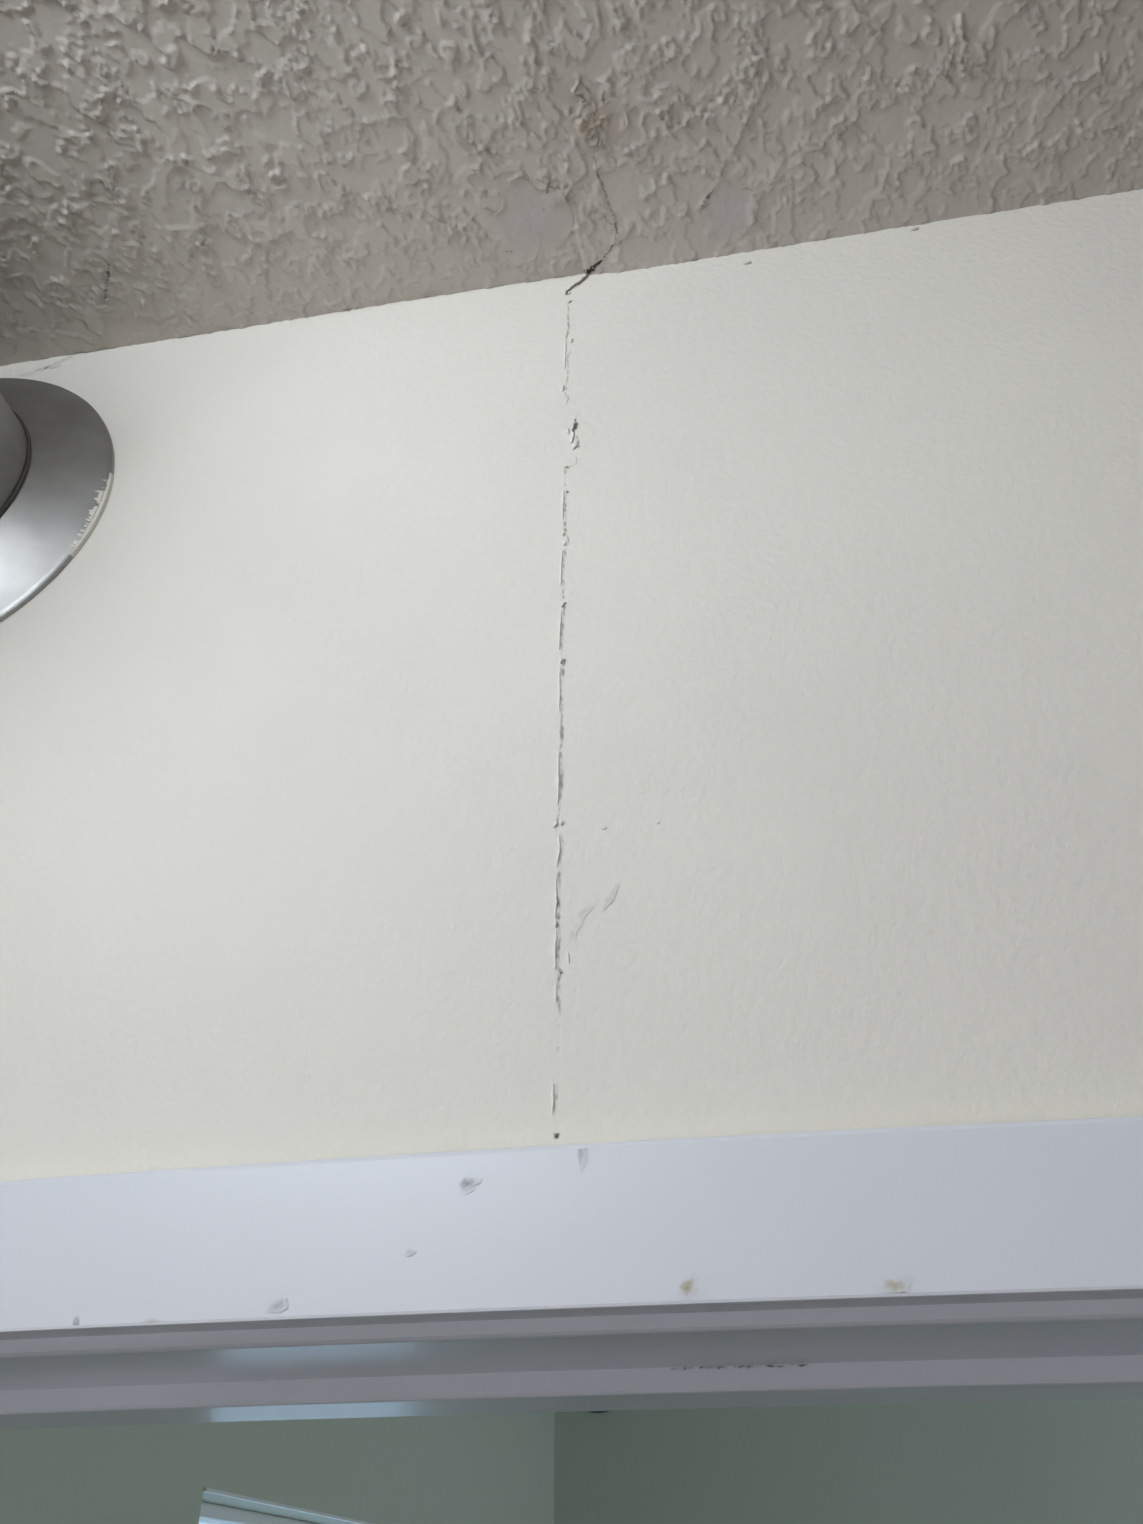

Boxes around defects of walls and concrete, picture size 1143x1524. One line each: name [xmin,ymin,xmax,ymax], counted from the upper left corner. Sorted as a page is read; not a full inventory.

crack [558,228,617,713]
crack [553,750,619,1001]
crack [550,1084,558,1137]